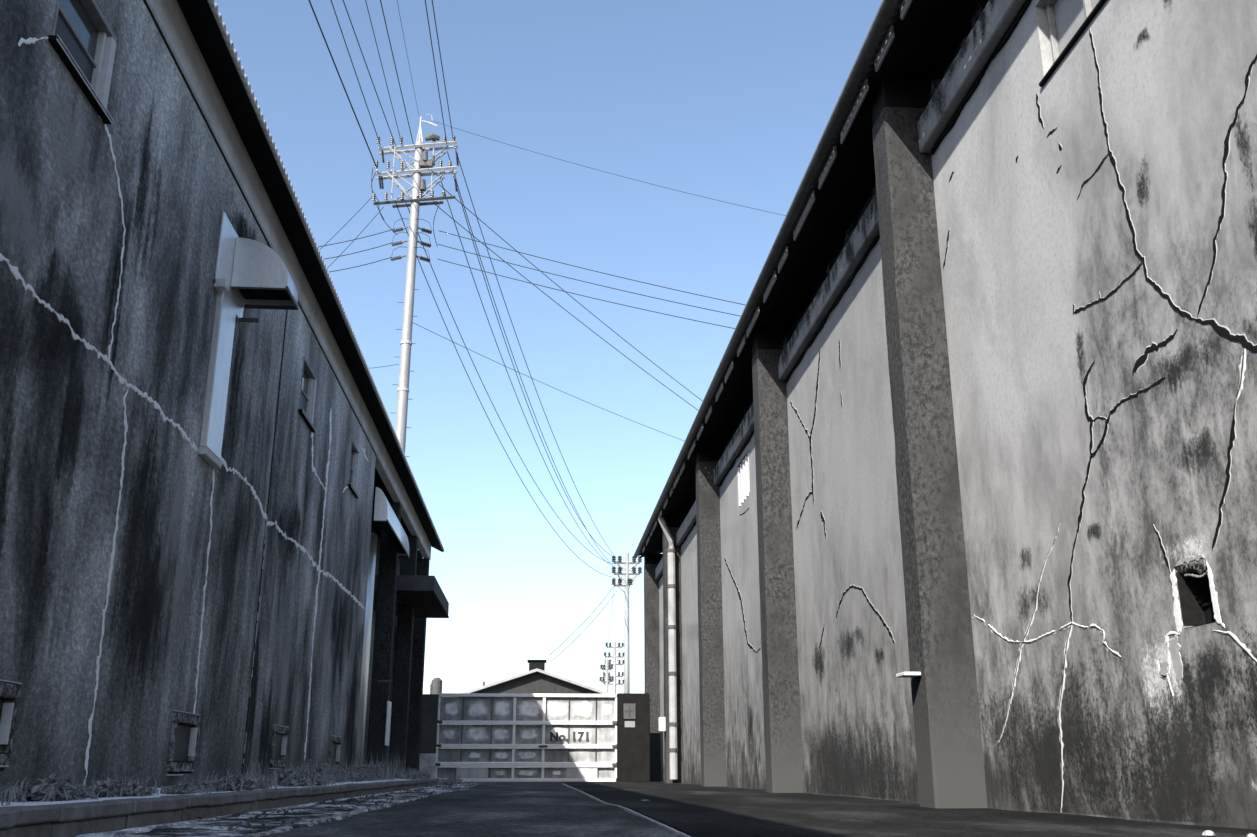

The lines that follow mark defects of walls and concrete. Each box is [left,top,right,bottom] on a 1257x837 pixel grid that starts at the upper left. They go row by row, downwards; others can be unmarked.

leakage [33,251,83,484]
leakage [102,116,161,400]
crack [0,116,364,785]
leakage [224,340,245,485]
crack [790,338,843,538]
leakage [1076,332,1086,382]
crack [971,28,1257,809]
leakage [1234,115,1257,254]
leakage [111,430,190,705]
leakage [247,619,289,767]
crack [819,584,895,649]
leakage [978,634,1257,822]